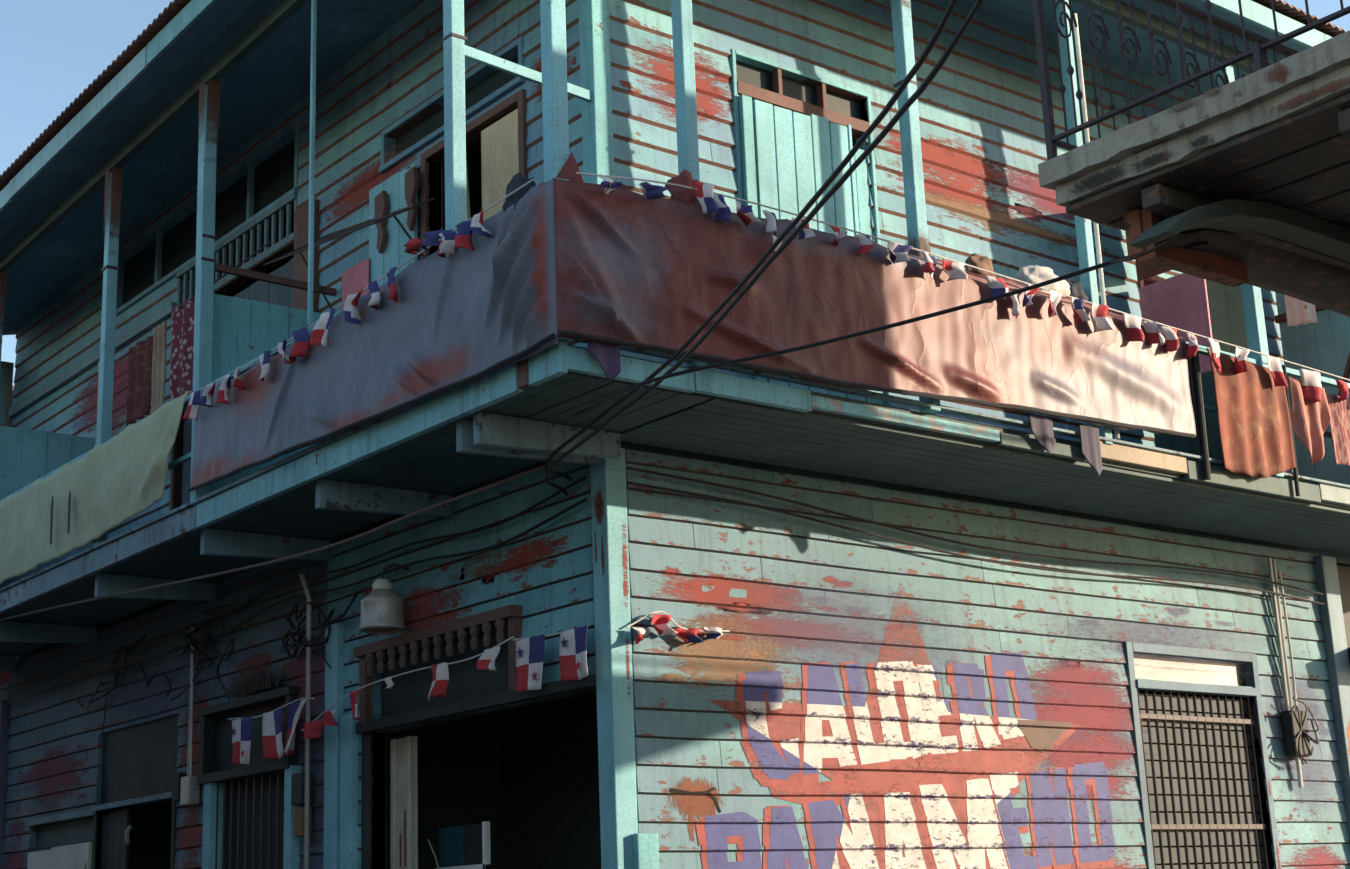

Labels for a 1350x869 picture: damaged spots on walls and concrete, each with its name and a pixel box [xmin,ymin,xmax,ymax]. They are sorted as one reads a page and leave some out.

peeling [620,42,676,120]
peeling [694,51,734,130]
peeling [319,145,417,228]
peeling [876,126,905,198]
peeling [919,120,1163,262]
peeling [371,535,573,638]
peeling [648,567,957,696]
peeling [4,745,99,869]